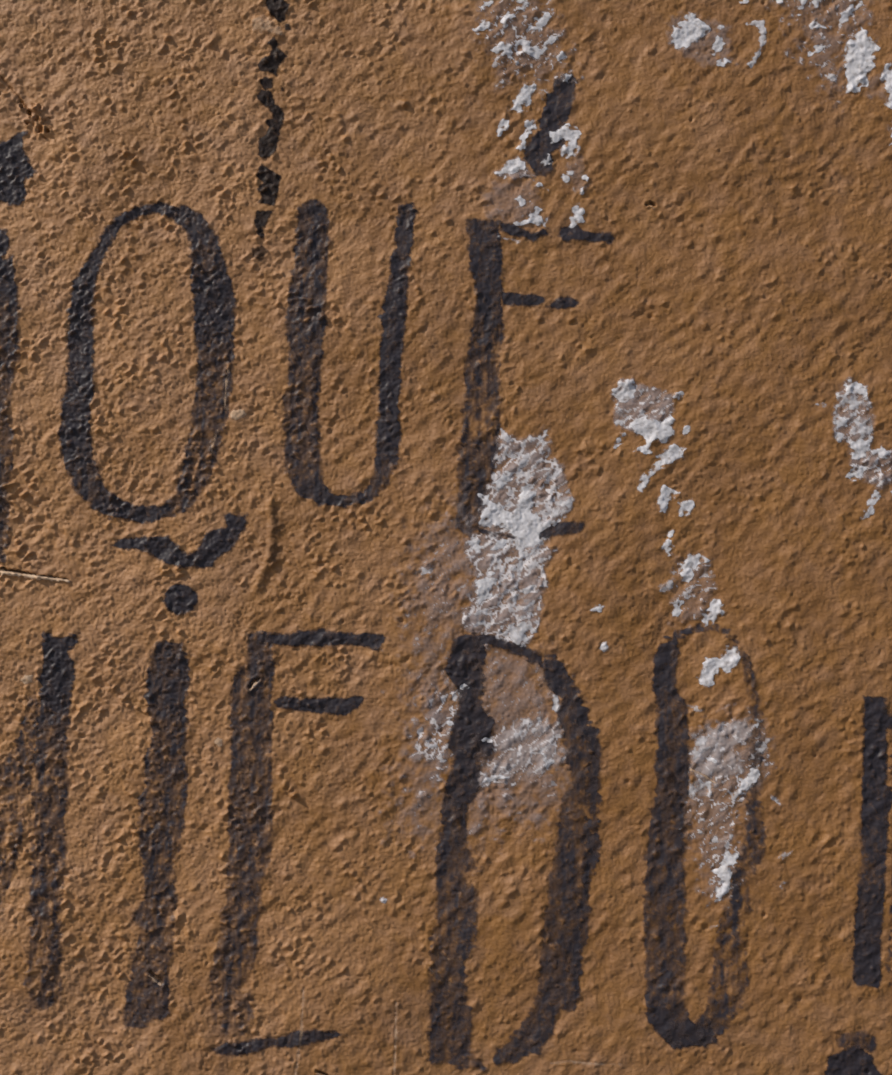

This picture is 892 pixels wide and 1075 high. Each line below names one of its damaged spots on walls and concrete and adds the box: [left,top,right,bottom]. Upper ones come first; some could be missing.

peeling [491,12,566,67]
peeling [671,13,730,67]
peeling [828,27,892,109]
peeling [495,84,536,179]
peeling [541,123,589,228]
peeling [612,379,690,492]
peeling [833,379,891,481]
crack [0,567,69,582]
peeling [468,429,572,647]
peeling [660,530,710,616]
peeling [699,647,741,687]
peeling [712,851,739,902]